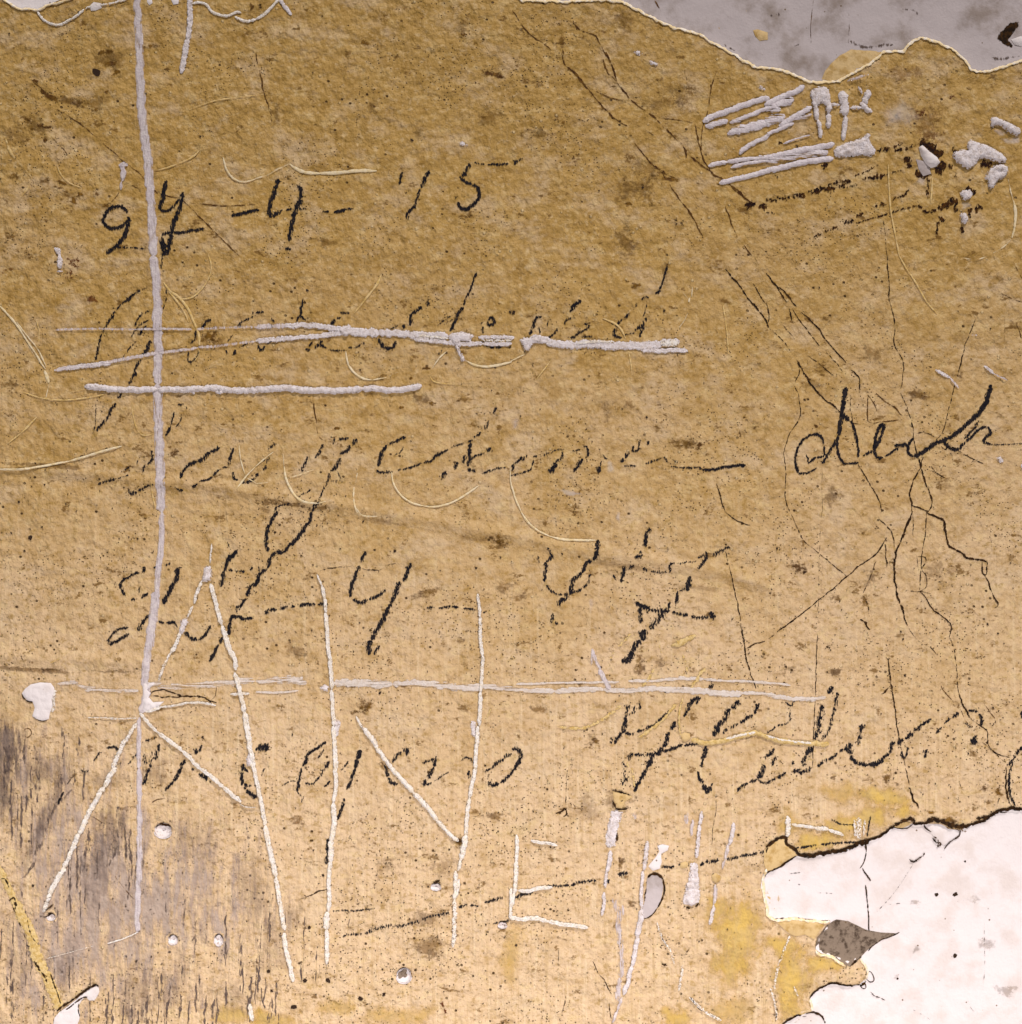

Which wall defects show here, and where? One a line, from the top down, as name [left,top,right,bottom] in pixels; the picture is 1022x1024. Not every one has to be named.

peeling [520,0,1022,106]
crack [513,12,1012,807]
peeling [761,806,1022,1024]